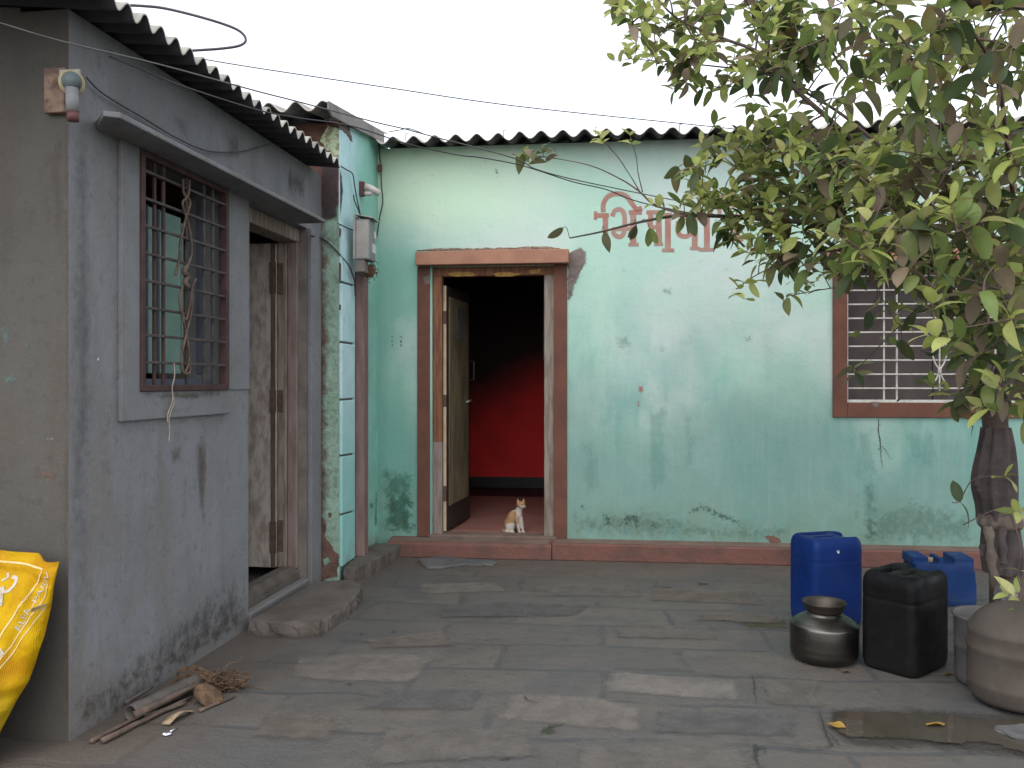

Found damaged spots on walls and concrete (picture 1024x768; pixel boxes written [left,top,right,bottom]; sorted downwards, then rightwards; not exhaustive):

leakage [322,167,343,219]
flaking render [417,246,584,298]
peeling [321,513,339,580]